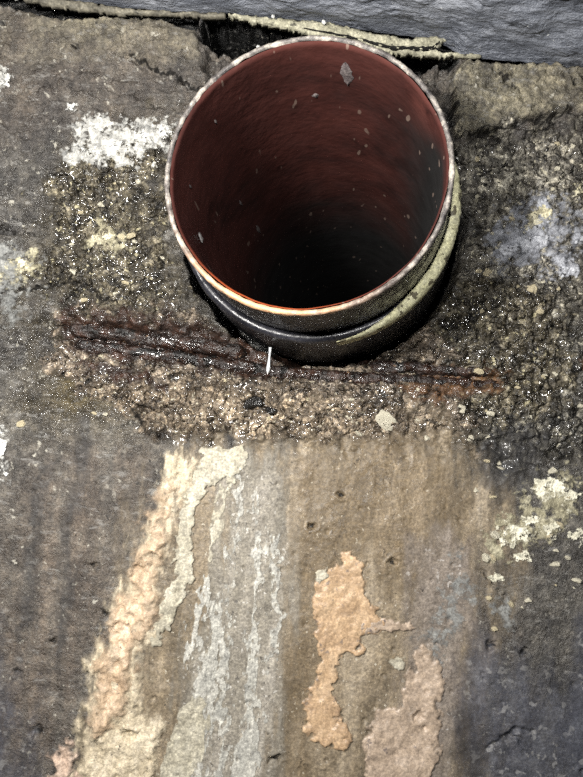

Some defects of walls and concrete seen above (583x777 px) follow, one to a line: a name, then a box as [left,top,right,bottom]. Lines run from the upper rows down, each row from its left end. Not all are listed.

leakage [0,65,13,92]
leakage [60,103,176,175]
leakage [483,183,583,282]
rust [58,306,277,393]
rust [400,365,502,406]
leakage [0,424,9,481]
leakage [128,409,583,777]
peeling [302,551,415,751]
peeling [362,644,445,777]